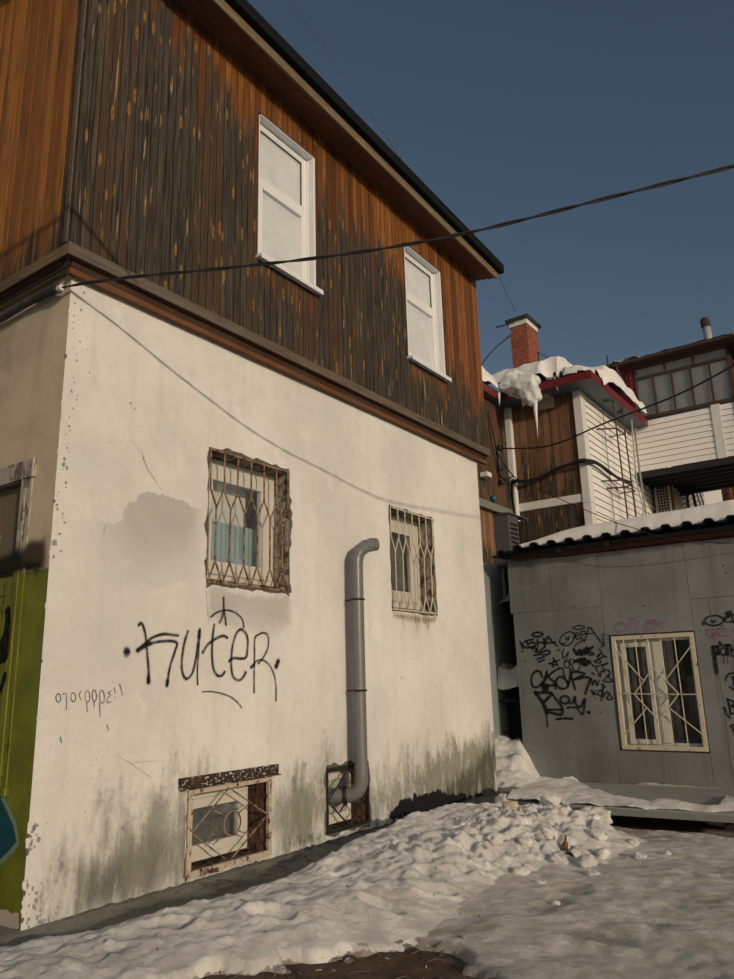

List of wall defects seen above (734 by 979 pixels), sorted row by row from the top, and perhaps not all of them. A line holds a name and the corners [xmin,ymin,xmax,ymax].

water stain [78,797,186,901]
water stain [276,778,326,853]
water stain [369,739,497,828]
spalling [389,790,483,821]